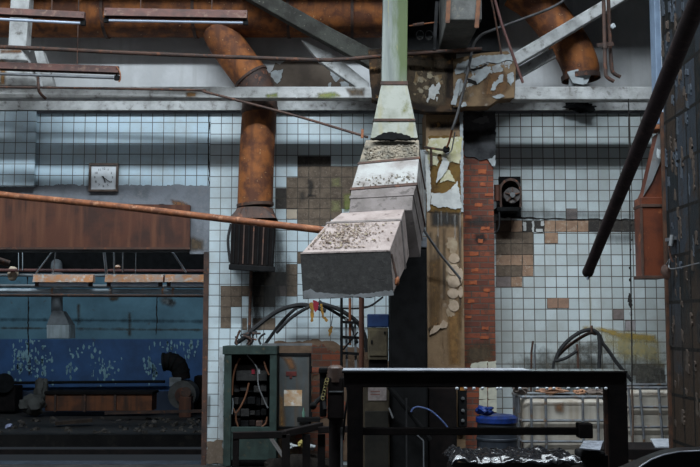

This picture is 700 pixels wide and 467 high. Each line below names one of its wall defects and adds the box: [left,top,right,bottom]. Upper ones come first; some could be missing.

peeling [661,0,684,57]
peeling [424,54,514,219]
peeling [665,66,696,241]
peeling [275,156,358,226]
peeling [446,237,457,289]
peeling [469,208,602,292]
peeling [611,220,635,232]
flaking render [428,298,455,352]
peeling [8,339,54,381]
peeling [66,342,122,387]
peeling [143,340,199,385]
leakage [343,343,659,383]